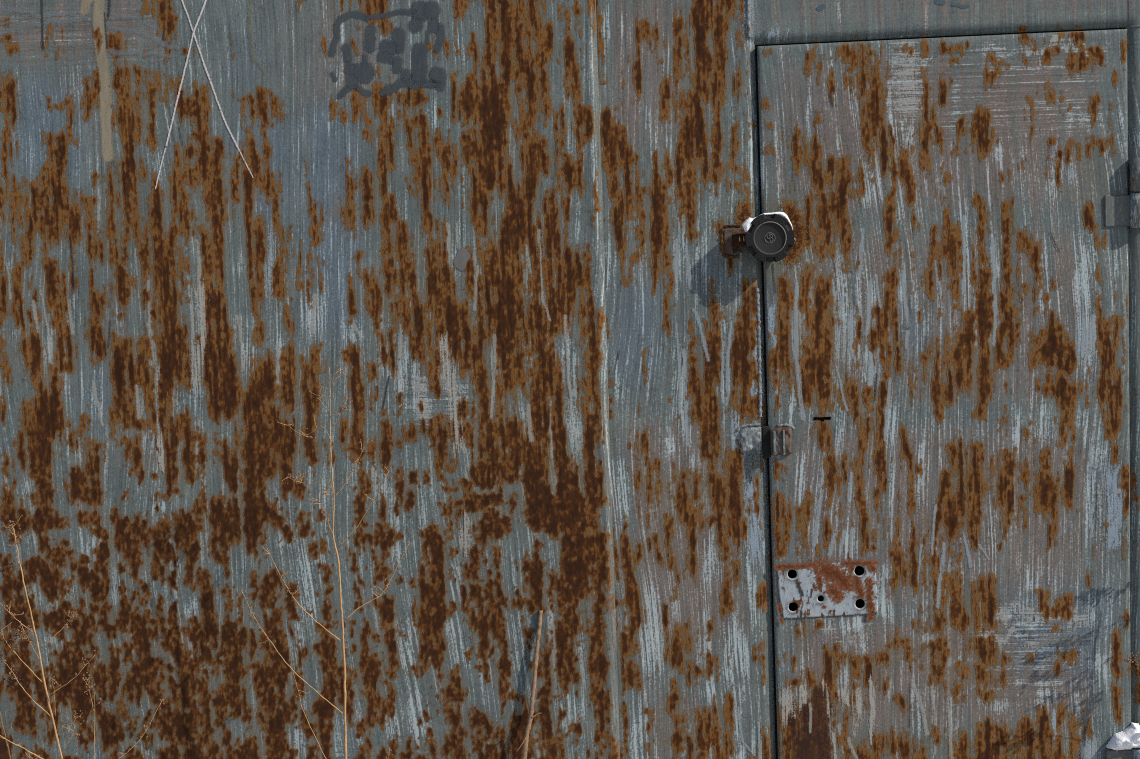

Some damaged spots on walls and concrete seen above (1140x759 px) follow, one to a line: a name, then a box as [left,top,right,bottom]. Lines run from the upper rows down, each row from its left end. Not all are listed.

corrosion [0,0,764,759]
corrosion [725,25,1140,759]